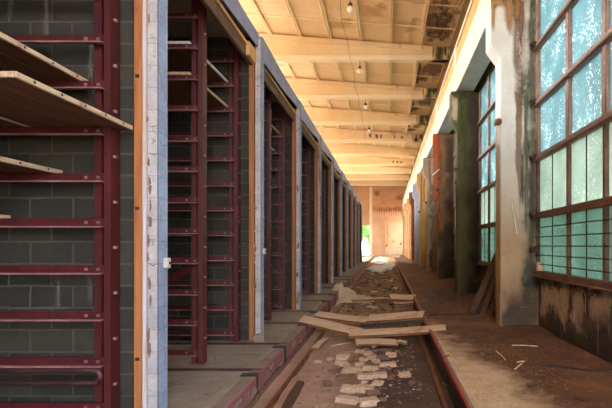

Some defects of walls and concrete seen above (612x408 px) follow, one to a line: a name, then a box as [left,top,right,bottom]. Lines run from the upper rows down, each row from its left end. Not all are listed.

peeling [426,0,461,42]
damp [429,93,480,294]
damp [501,0,612,364]